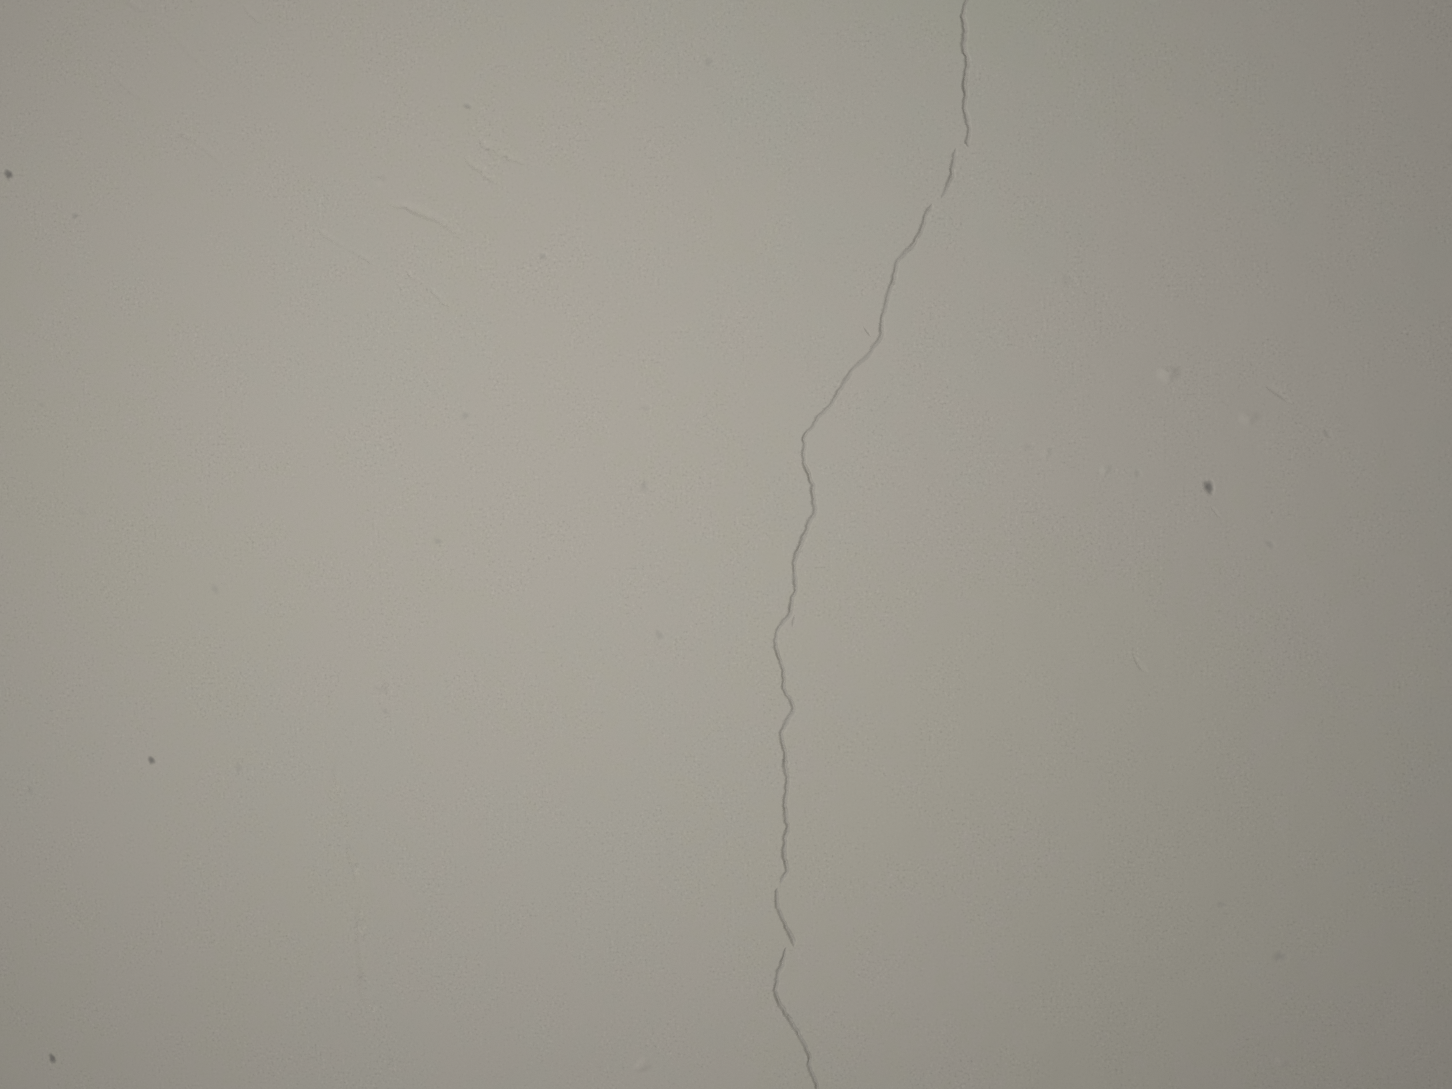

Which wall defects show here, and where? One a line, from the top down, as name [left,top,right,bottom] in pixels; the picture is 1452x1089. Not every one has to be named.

crack [772,0,973,1089]